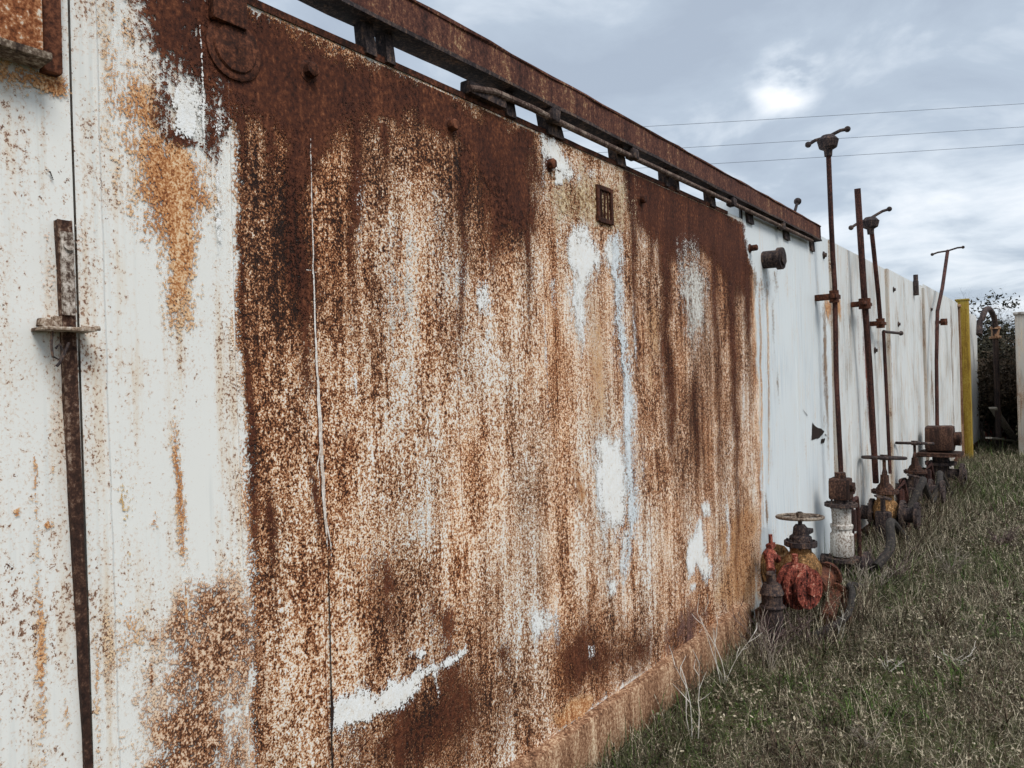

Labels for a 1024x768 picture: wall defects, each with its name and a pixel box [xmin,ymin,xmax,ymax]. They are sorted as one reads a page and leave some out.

corrosion [88,0,779,768]
peeling [803,410,829,444]